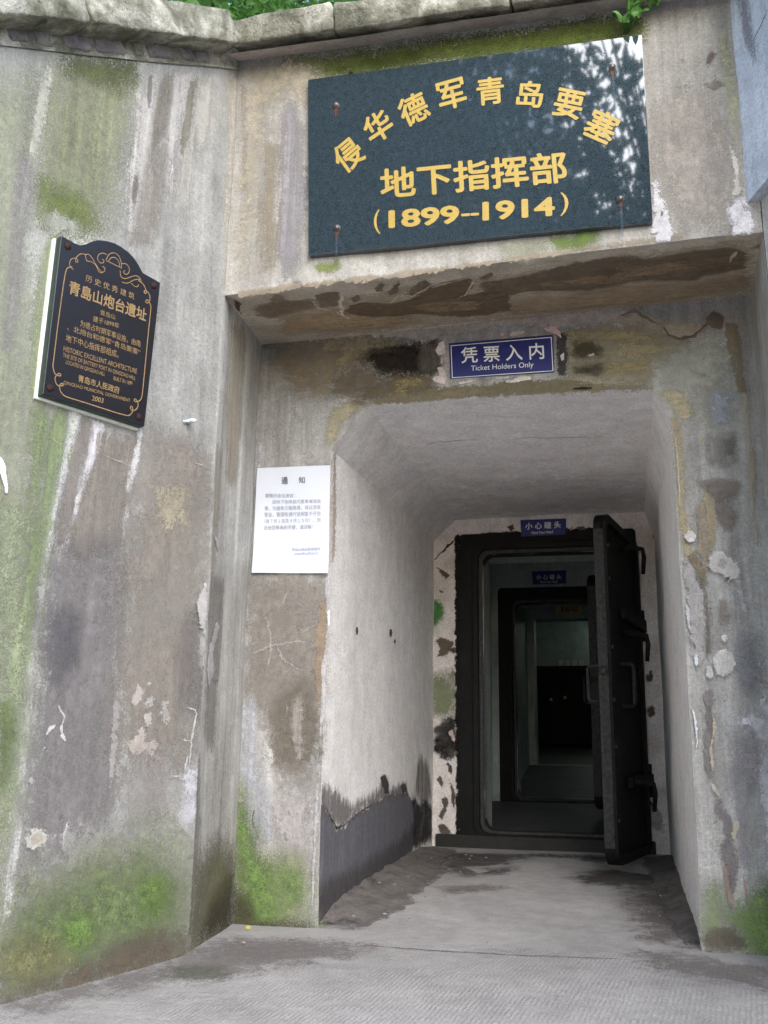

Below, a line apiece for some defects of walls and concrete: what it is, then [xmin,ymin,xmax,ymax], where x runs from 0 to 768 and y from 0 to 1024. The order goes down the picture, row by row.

leakage [255,78,761,556]
leakage [2,326,245,935]
peeling [109,682,170,788]
leakage [240,573,432,885]
peeling [436,637,455,657]
peeling [437,762,456,834]
spalling [682,556,740,909]
peeling [708,551,748,612]